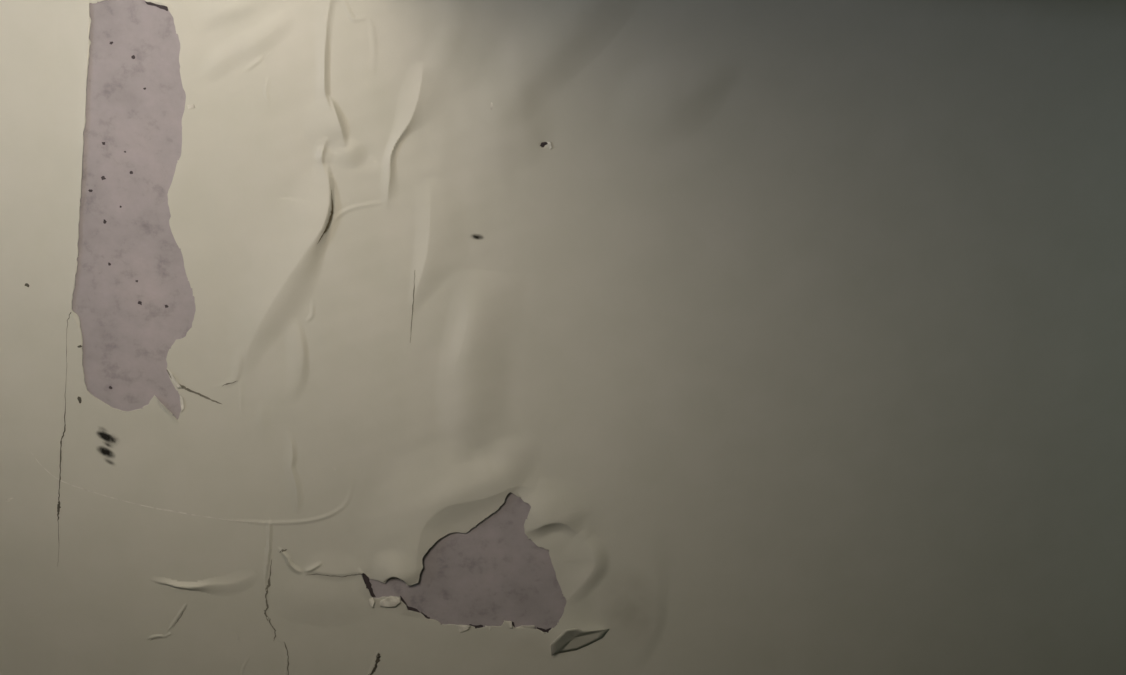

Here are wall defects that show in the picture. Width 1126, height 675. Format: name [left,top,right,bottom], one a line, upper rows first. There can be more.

peeling [41,0,228,449]
crack [57,312,71,567]
crack [264,549,289,675]
peeling [334,440,612,659]